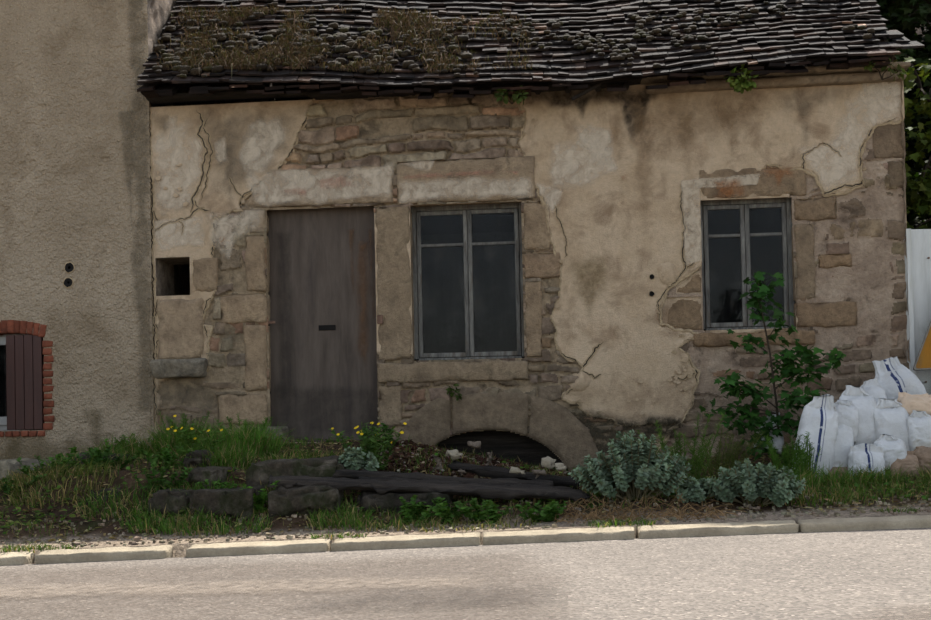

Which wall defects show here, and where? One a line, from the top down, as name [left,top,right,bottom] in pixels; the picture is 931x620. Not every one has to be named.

crack [149,110,307,430]
peeling [156,82,909,469]
leakage [536,88,653,132]